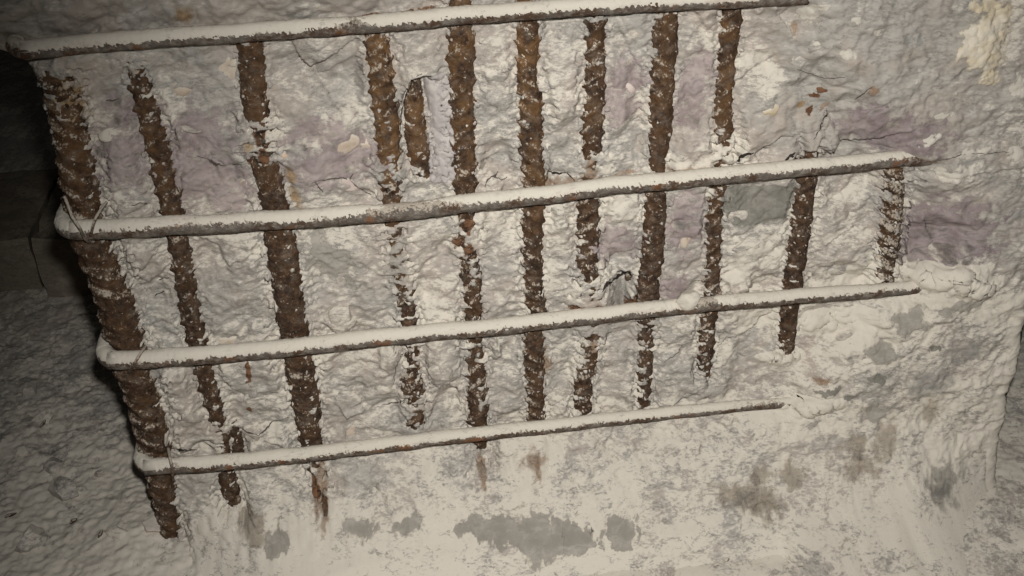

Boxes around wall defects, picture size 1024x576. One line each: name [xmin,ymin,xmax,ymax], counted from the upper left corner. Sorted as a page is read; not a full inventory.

corrosion [797,87,829,116]
corrosion [245,130,270,165]
spalling [0,0,992,351]
crack [928,151,1008,162]
corrosion [452,217,475,257]
spalling [112,289,939,576]
corrosion [312,461,328,521]
water stain [454,511,641,571]